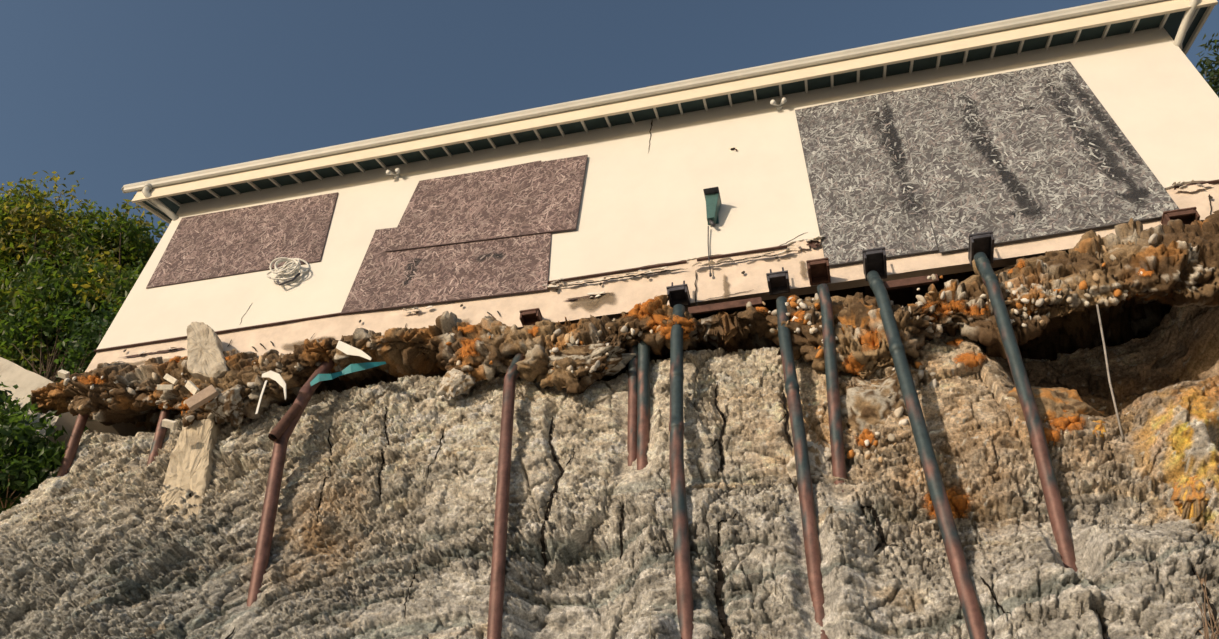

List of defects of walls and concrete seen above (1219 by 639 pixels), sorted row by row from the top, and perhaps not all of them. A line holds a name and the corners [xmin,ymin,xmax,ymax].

flaking render [692,236,825,267]
flaking render [542,267,668,301]
spalling [109,347,185,364]
rust [457,316,496,357]
rust [620,298,695,340]
rust [920,300,991,322]
crack [710,382,726,476]
rust [856,428,874,447]
crack [537,411,575,572]
crack [860,505,905,552]
crack [712,512,738,639]
crack [1096,609,1110,639]